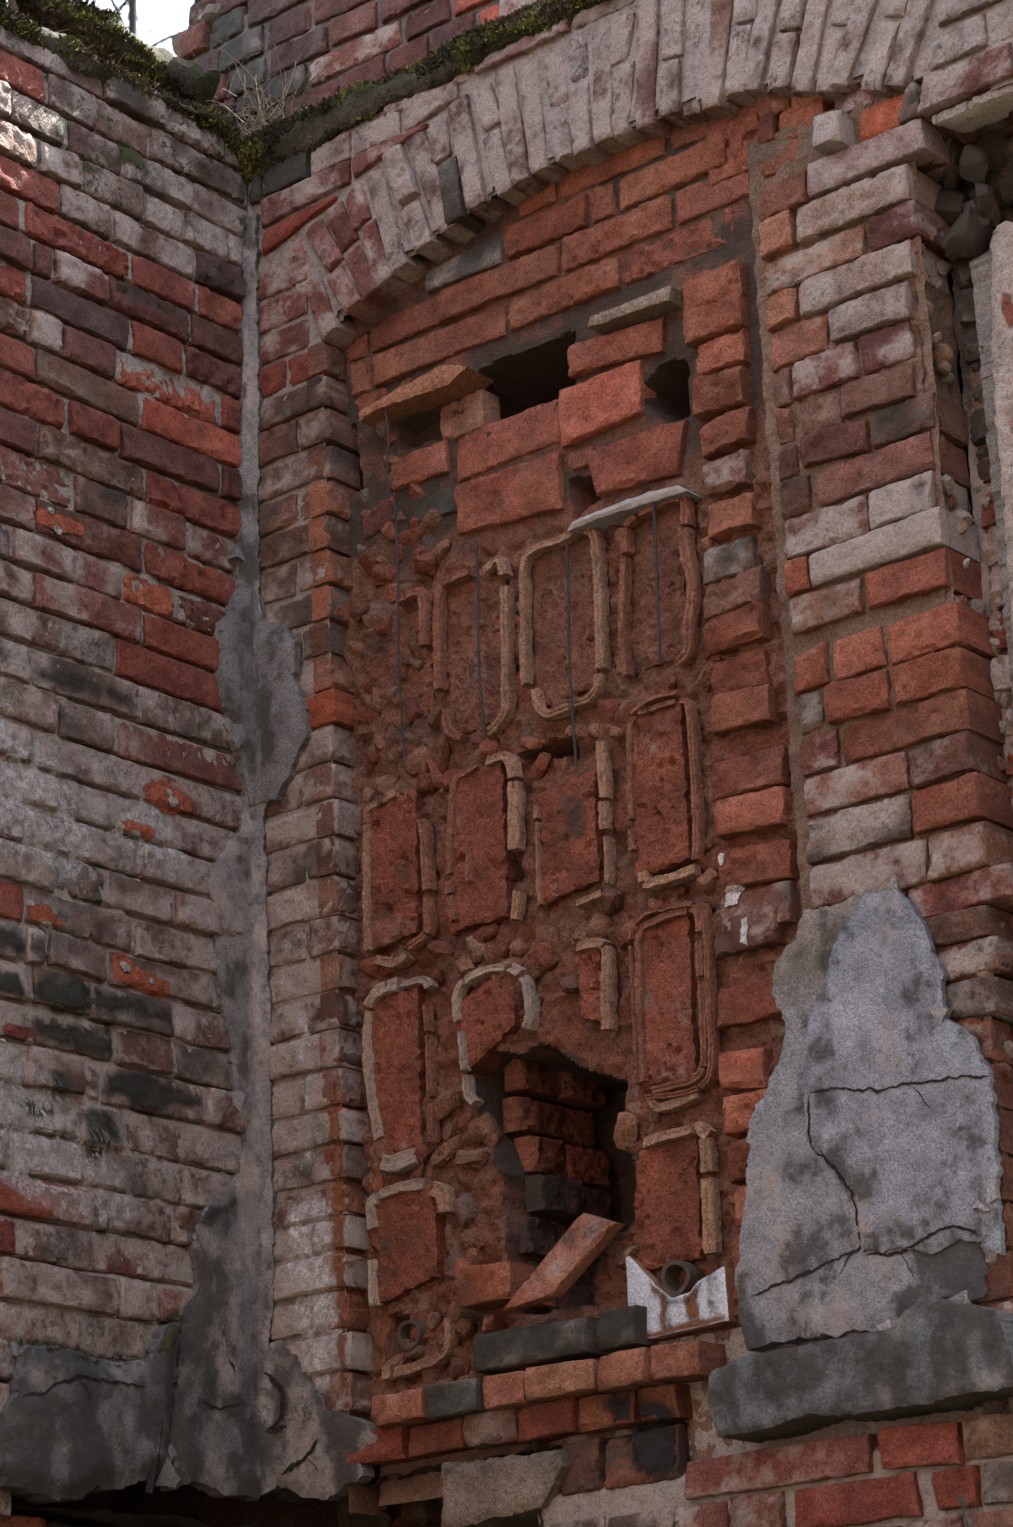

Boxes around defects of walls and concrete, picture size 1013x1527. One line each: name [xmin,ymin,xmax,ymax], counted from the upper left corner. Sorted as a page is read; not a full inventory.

spalling [1002,293,1013,327]
flaking render [0,206,379,1508]
crack [751,1075,1012,1296]